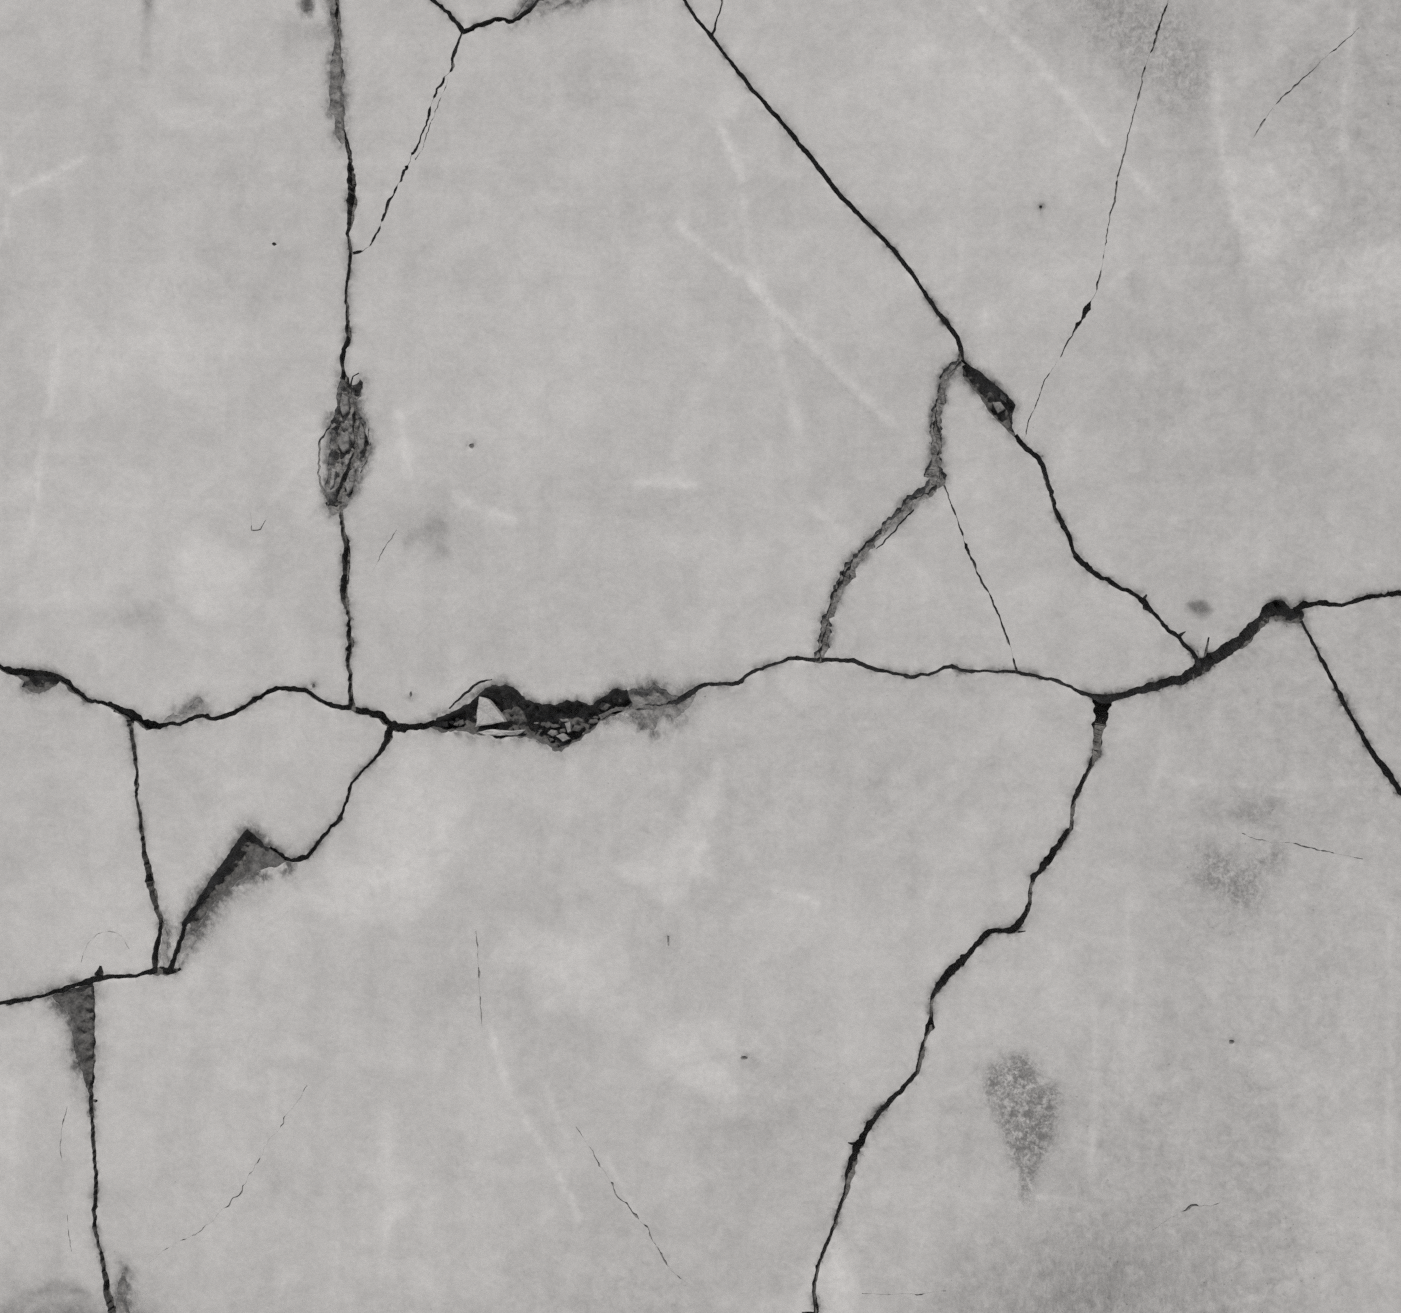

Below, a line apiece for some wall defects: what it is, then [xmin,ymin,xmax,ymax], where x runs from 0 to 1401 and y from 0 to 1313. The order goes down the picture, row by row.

spalling [324,377,372,516]
crack [0,0,542,1313]
spalling [431,679,696,752]
crack [599,0,1401,1313]
spalling [159,828,293,967]
crack [576,1127,683,1280]